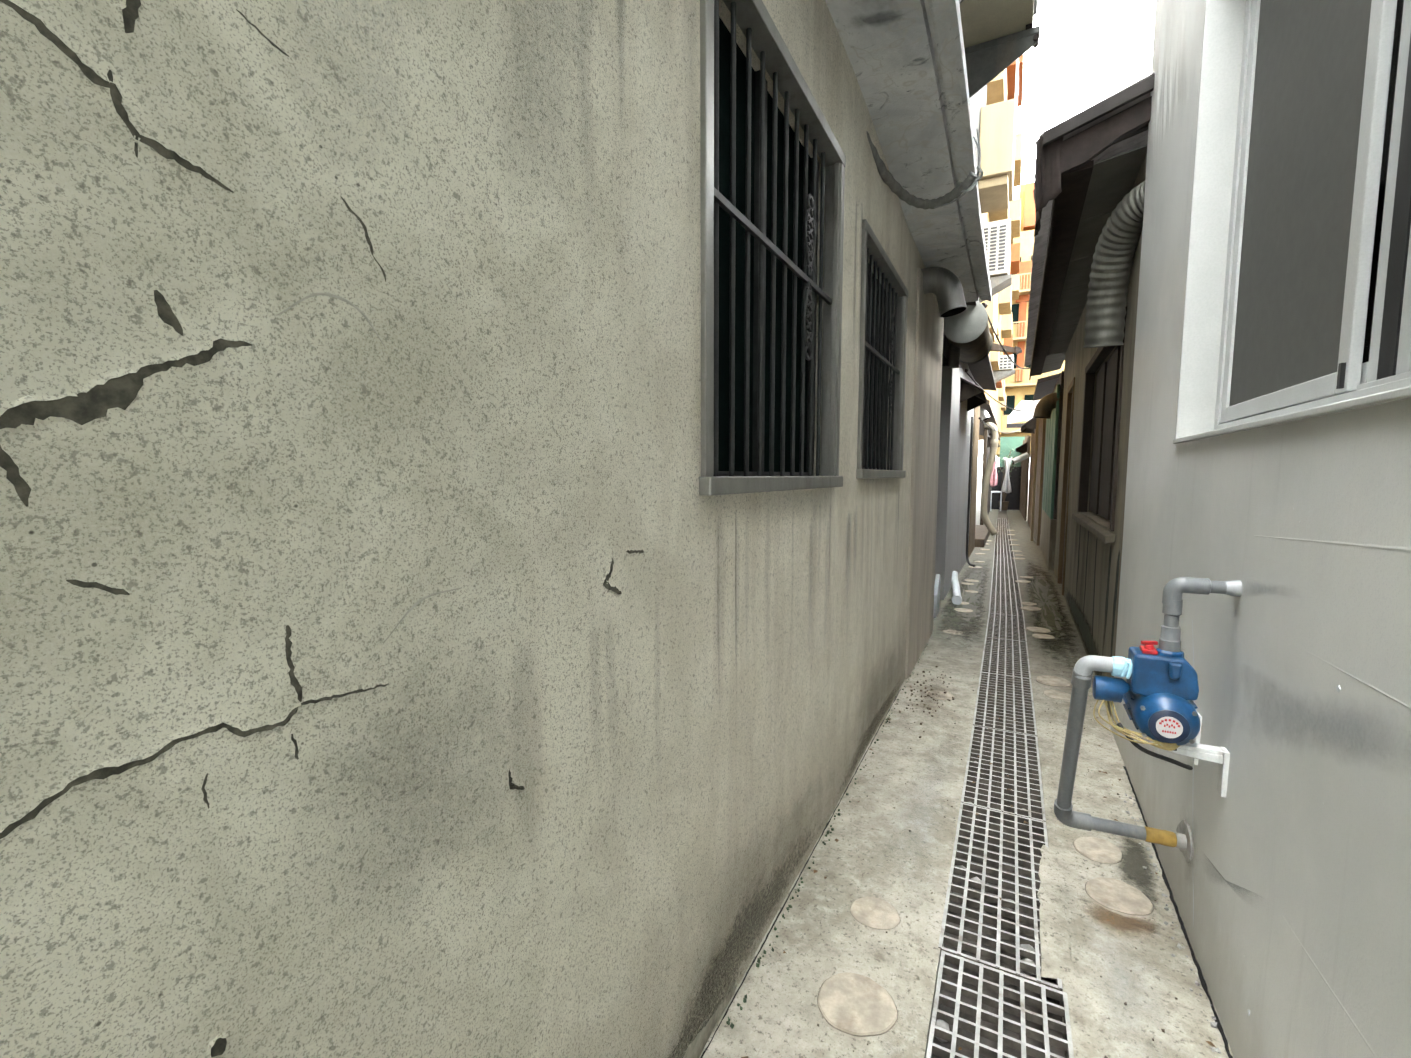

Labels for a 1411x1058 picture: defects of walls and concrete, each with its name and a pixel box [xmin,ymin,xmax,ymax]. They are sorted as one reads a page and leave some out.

crack [0,0,235,199]
crack [234,3,289,64]
crack [337,193,391,282]
crack [0,289,253,508]
crack [63,570,134,602]
crack [0,622,390,849]